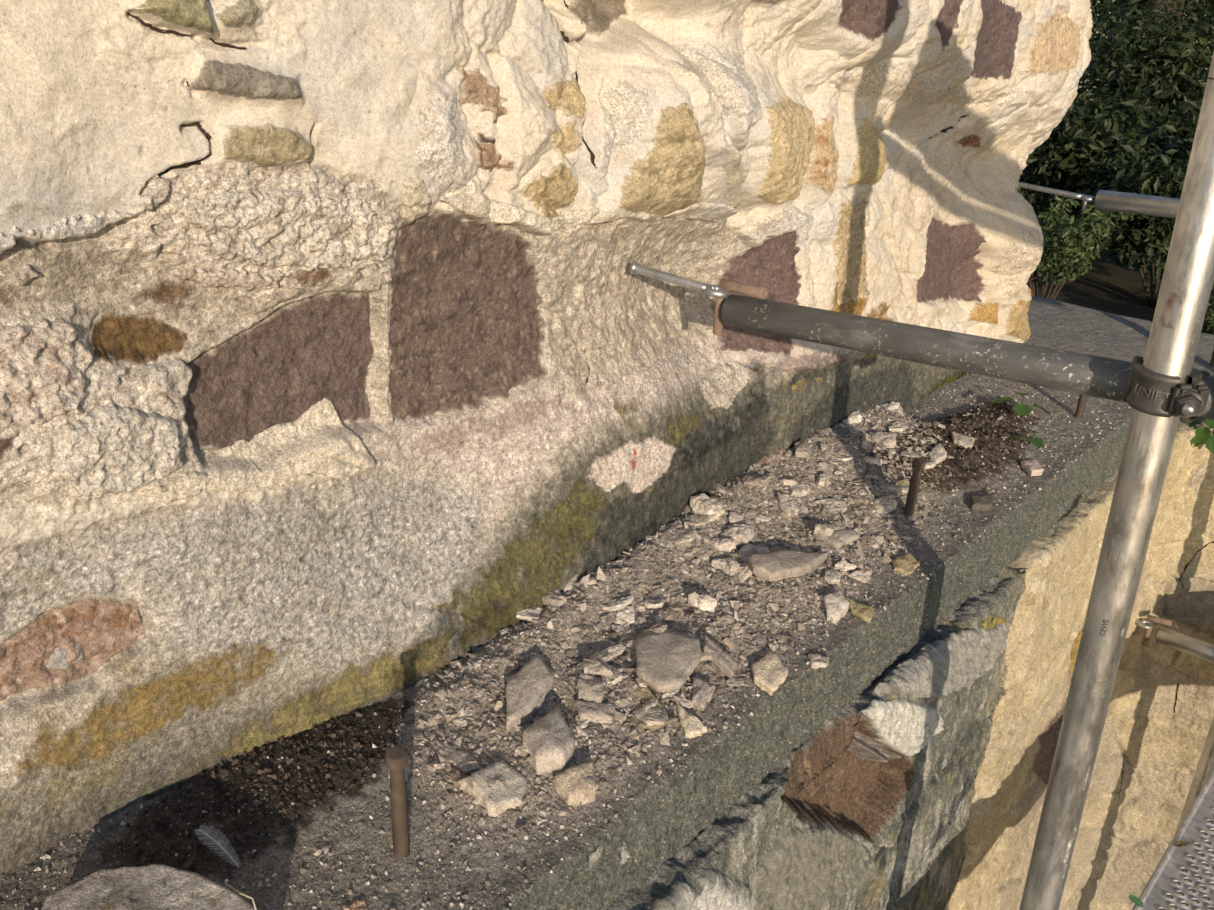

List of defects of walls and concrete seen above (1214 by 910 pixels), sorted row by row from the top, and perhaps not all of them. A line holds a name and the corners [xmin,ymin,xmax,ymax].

spalling [0,66,625,504]